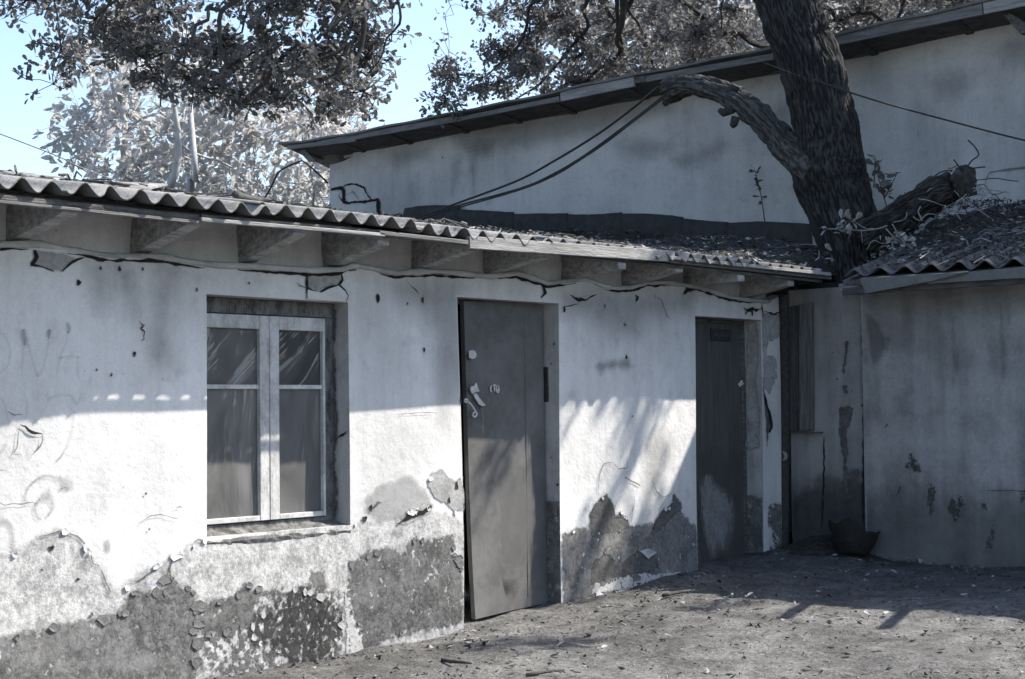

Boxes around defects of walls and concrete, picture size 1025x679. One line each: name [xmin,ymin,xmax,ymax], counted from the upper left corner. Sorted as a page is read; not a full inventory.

crack [0,248,200,272]
crack [238,269,780,319]
peeling [0,354,465,679]
peeling [562,494,699,602]
crack [598,462,670,512]
peeling [839,406,859,497]